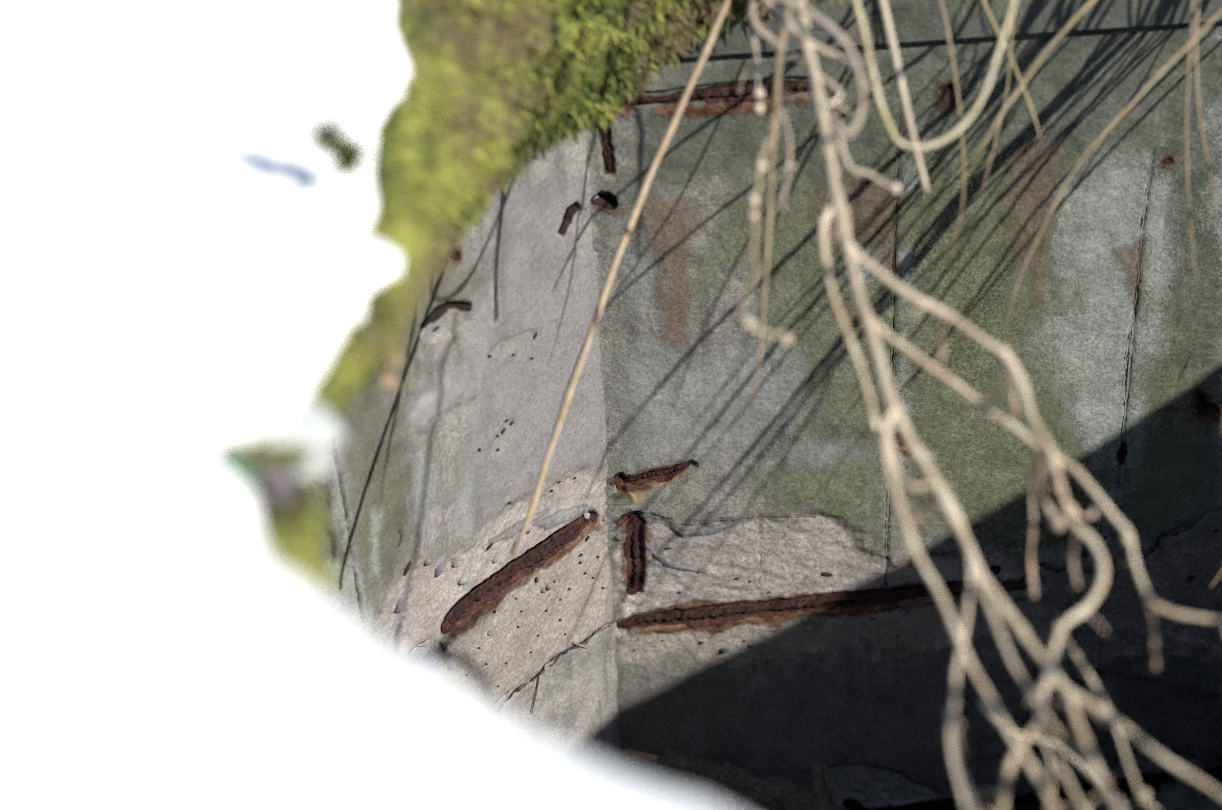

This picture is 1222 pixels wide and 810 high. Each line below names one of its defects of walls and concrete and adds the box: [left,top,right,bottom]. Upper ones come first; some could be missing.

rust [599,120,616,174]
rust [616,80,812,118]
damp [622,343,802,457]
damp [945,104,1222,570]
crack [1021,154,1222,581]
rust [440,510,601,663]
rust [612,461,692,601]
spalling [372,464,1222,708]
rust [617,578,1031,636]
crack [1048,602,1222,742]
spalling [1111,745,1222,779]